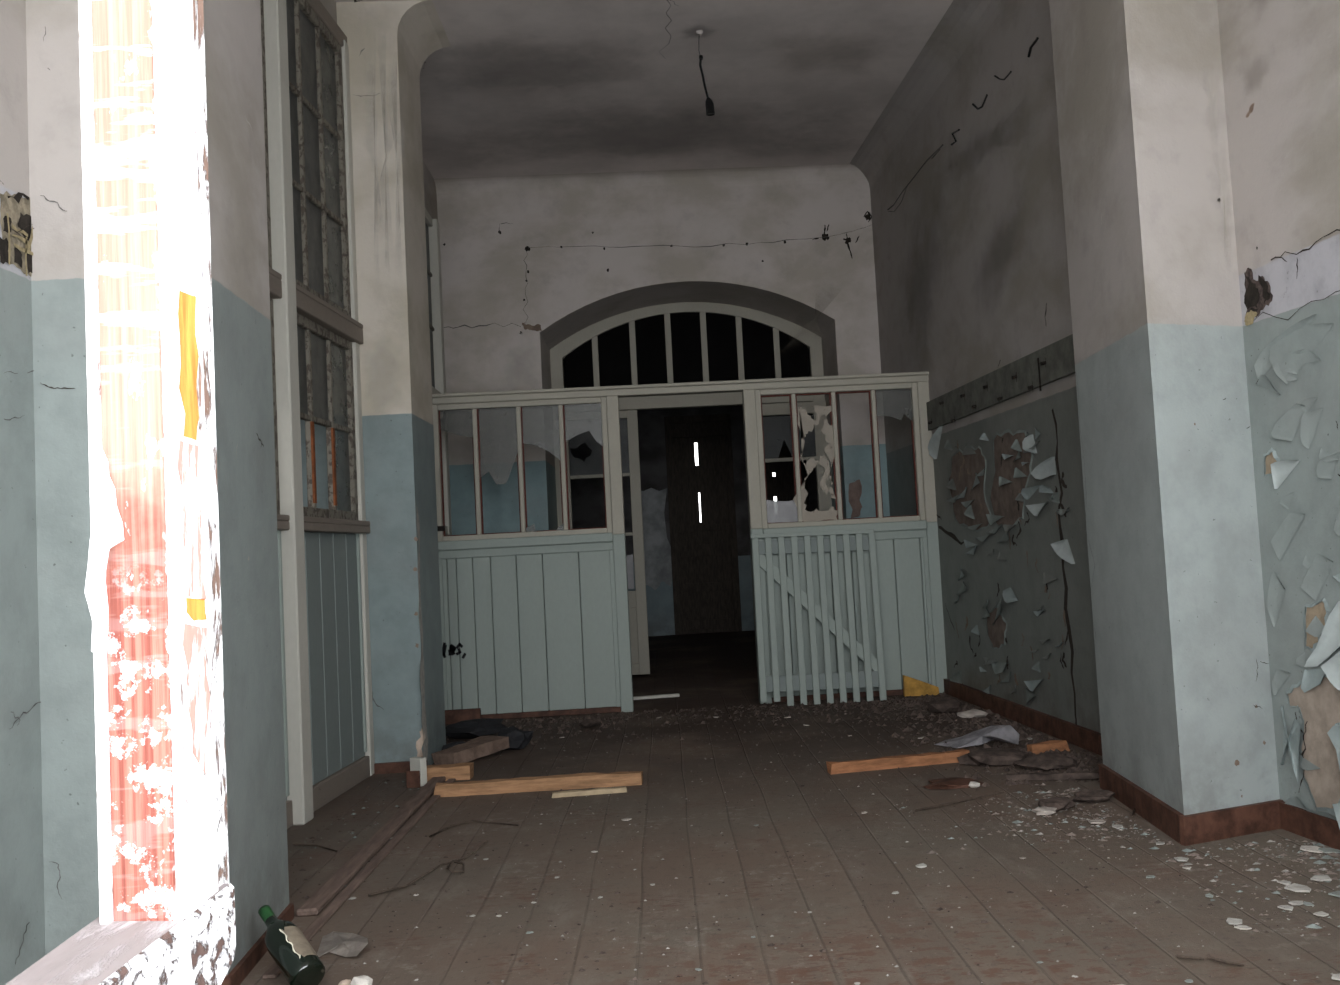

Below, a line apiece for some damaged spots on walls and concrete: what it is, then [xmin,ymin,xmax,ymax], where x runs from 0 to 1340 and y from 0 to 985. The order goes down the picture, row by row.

spalling [0,191,34,277]
spalling [1244,268,1273,326]
peeling [1263,447,1300,489]
peeling [928,426,1075,704]
peeling [1280,597,1340,829]